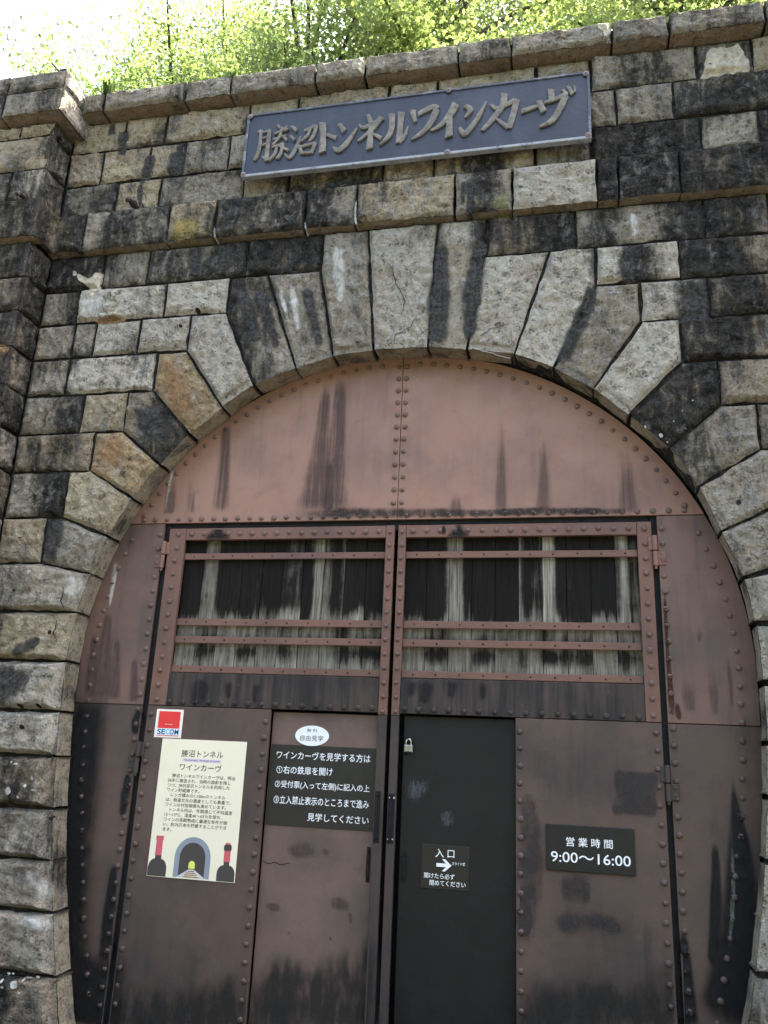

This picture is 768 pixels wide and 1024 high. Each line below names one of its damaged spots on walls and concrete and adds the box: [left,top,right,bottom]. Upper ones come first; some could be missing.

water stain [137,155,155,206]
water stain [167,152,185,176]
crack [393,274,417,344]
water stain [427,245,450,342]
water stain [462,240,487,338]
water stain [558,288,597,362]
water stain [217,428,230,508]
water stain [306,386,345,508]
water stain [709,849,735,963]